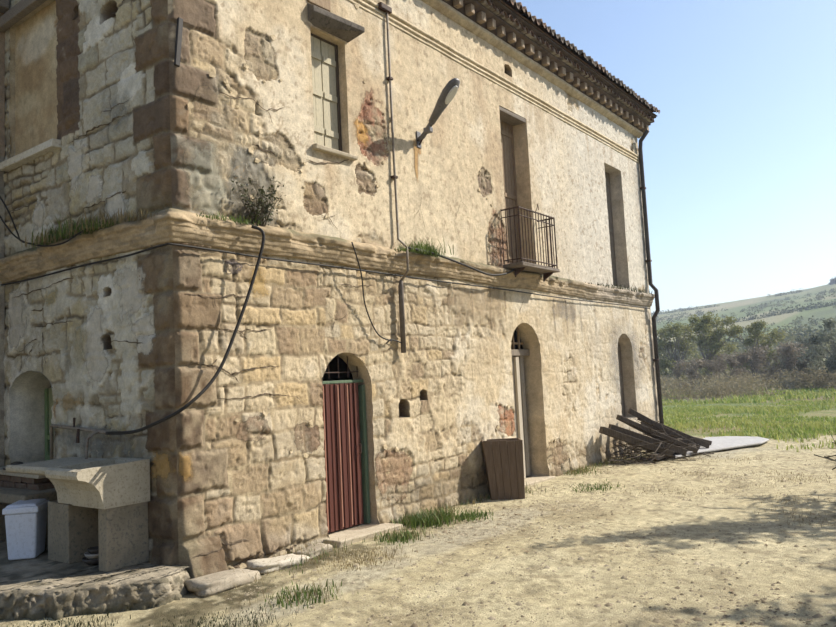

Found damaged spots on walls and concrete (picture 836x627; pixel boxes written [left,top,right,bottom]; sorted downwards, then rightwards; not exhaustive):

crack [215,89,284,122]
peeling [179,72,330,219]
peeling [243,29,283,84]
peeling [355,80,392,196]
peeling [477,167,508,268]
peeling [496,402,515,436]